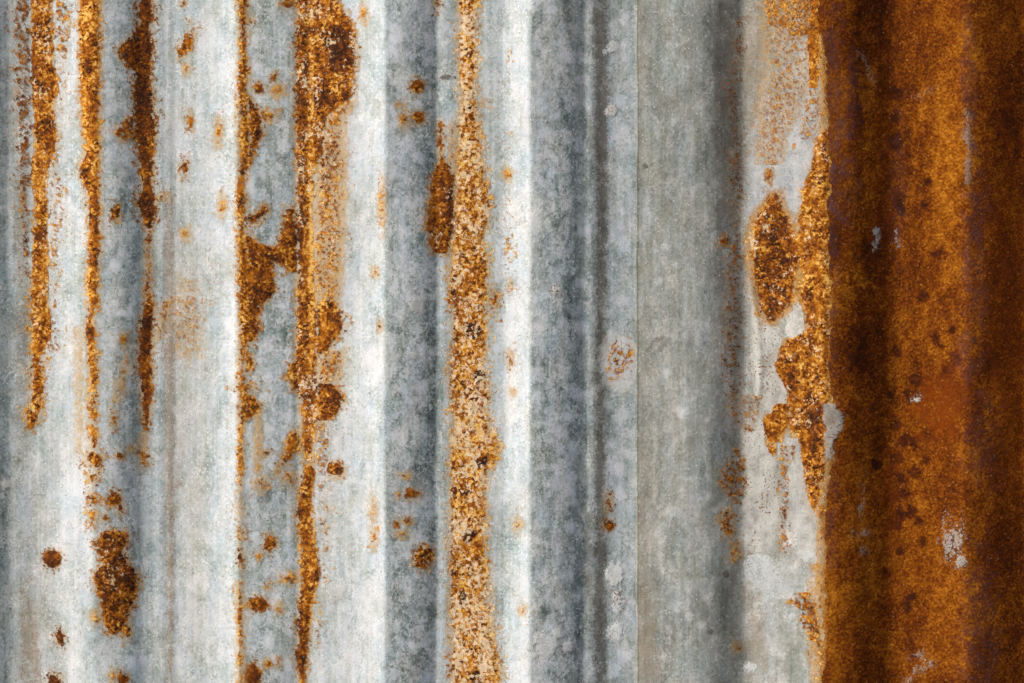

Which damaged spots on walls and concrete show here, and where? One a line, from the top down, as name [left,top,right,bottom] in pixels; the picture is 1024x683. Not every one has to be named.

corrosion [0,0,371,683]
corrosion [362,0,528,683]
corrosion [599,334,637,394]
corrosion [712,0,1024,683]